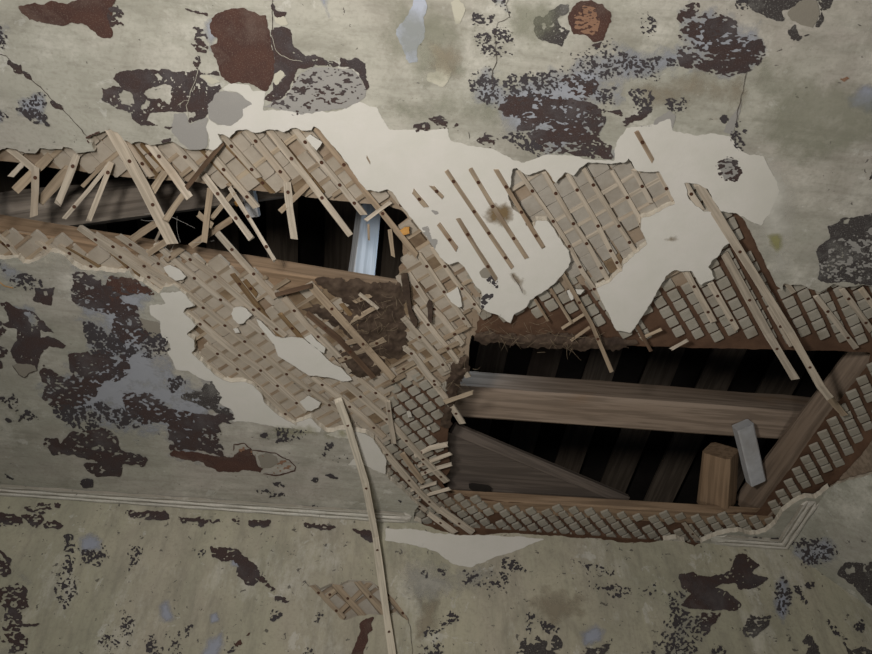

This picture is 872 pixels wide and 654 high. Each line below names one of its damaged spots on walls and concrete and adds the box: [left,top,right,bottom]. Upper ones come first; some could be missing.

peeling [0,92,50,127]
crack [0,54,100,143]
flaking render [102,0,833,333]
peeling [816,213,872,286]
peeling [0,263,386,498]
peeling [0,550,39,654]
peeling [125,510,220,527]
peeling [232,518,271,528]
peeling [352,528,373,543]
peeling [651,554,815,654]
peeling [792,538,872,605]
peeling [827,619,872,654]